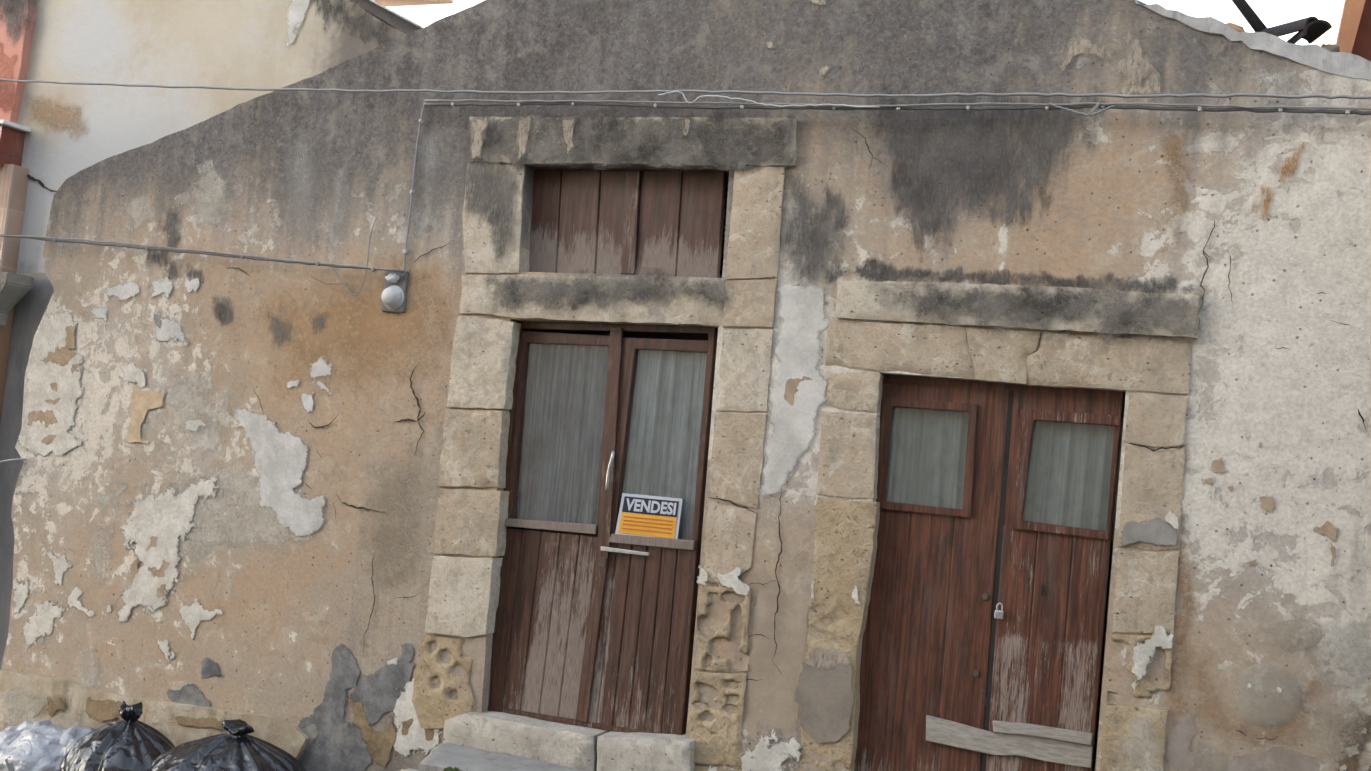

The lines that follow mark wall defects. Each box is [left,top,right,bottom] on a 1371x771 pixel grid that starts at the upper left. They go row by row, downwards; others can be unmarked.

leakage [0,0,28,44]
leakage [465,86,1201,337]
corrosion [1253,143,1305,219]
crack [1198,220,1233,331]
peeling [18,277,200,457]
crack [393,365,426,455]
peeling [233,408,325,537]
peeling [13,471,223,646]
crack [709,491,782,681]
spalling [1131,625,1174,691]
spalling [346,678,444,769]
spalling [706,729,802,771]